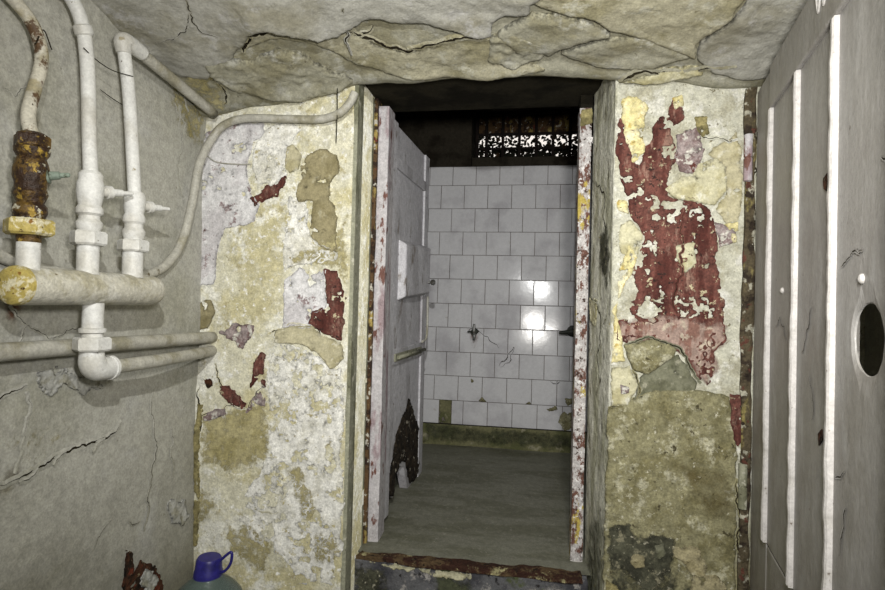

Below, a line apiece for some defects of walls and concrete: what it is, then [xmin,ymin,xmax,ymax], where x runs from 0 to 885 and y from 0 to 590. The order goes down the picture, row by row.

crack [160,0,220,44]
crack [240,33,312,53]
crack [333,8,490,56]
peeling [92,0,808,103]
crack [209,77,230,106]
peeling [167,122,347,585]
peeling [602,95,743,590]
crack [0,383,122,490]
peeling [439,399,452,423]
spalling [547,398,572,431]
flaking render [121,550,164,590]
spalling [370,561,472,581]